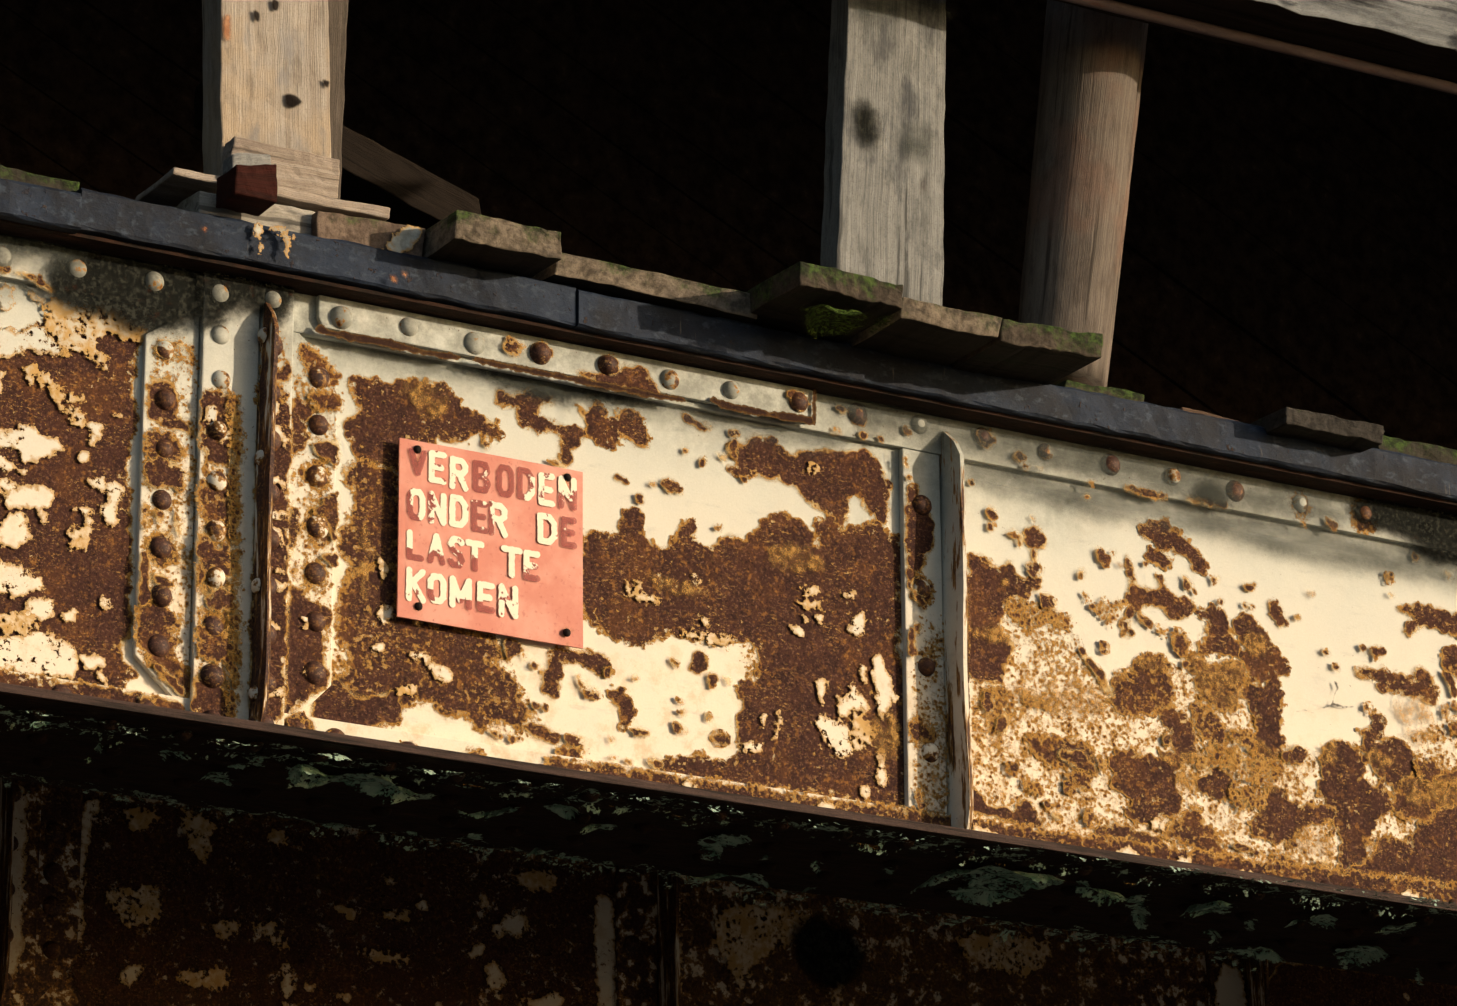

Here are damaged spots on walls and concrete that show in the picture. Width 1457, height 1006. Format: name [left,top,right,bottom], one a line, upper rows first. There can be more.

rust [0,266,52,292]
peeling [0,282,160,706]
peeling [343,374,653,473]
rust [133,324,951,827]
peeling [583,429,935,807]
rust [1124,484,1168,501]
rust [967,507,1457,902]
rust [1292,489,1377,535]